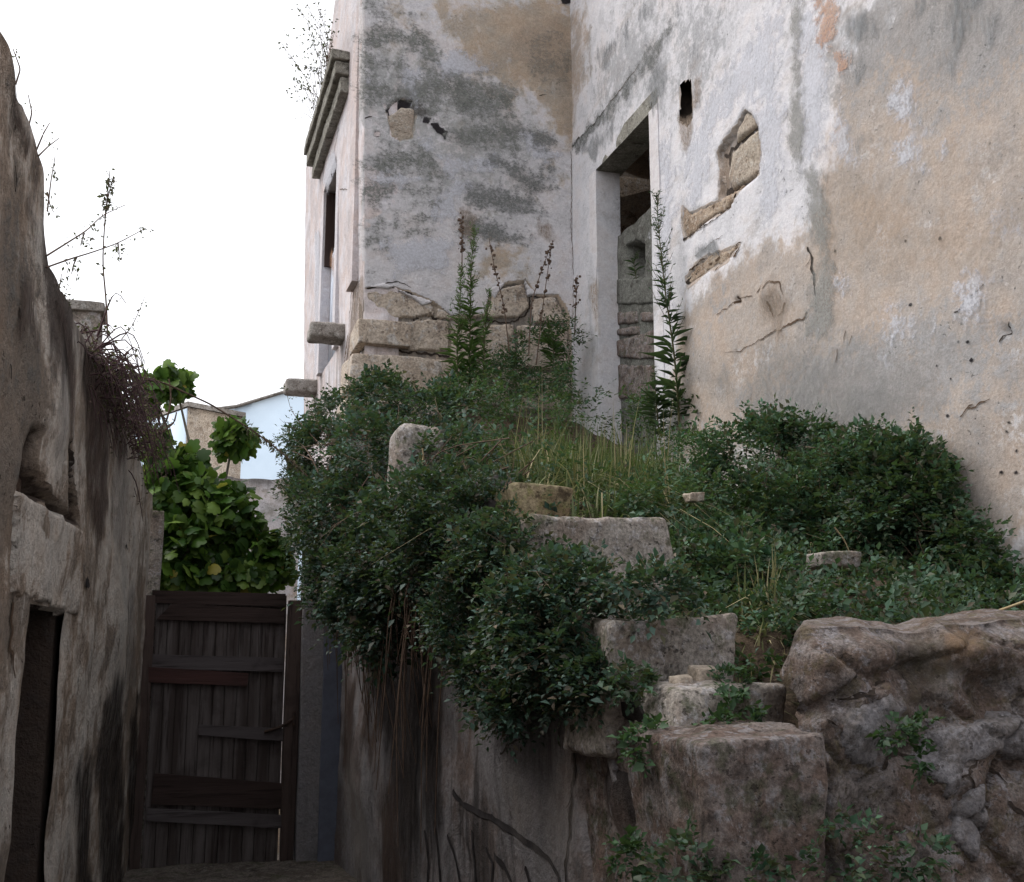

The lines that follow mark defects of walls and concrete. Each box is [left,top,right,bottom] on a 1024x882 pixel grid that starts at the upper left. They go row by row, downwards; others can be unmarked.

flaking render [386,67,429,140]
leakage [348,0,559,250]
peeling [437,49,489,79]
flaking render [683,113,762,284]
peeling [798,0,856,163]
flaking render [337,237,570,424]
crack [730,247,816,352]
leakage [75,674,138,882]